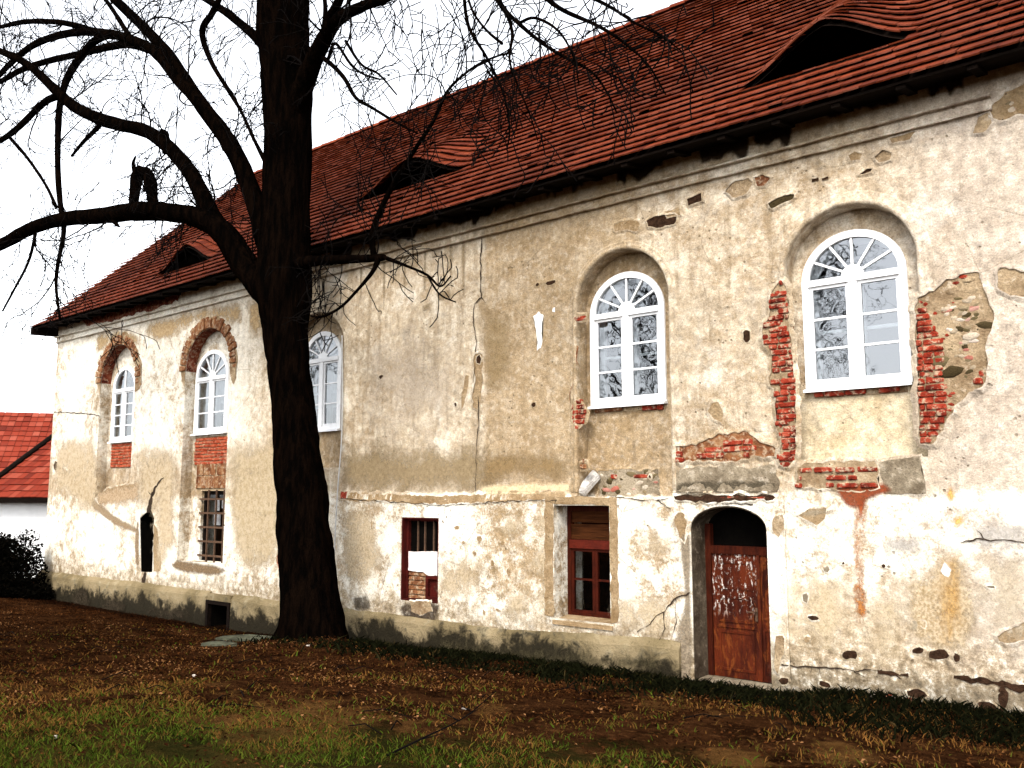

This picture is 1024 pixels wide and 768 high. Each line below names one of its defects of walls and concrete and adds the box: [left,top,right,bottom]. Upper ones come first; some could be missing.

spalling [970,79,1024,137]
spalling [846,129,920,178]
spalling [612,190,706,235]
spalling [723,172,798,213]
crack [473,239,485,352]
spalling [907,263,1024,450]
flaking render [572,397,590,430]
flaking render [579,277,881,544]
crack [147,477,164,513]
rust [837,484,889,617]
crack [961,531,1024,543]
crack [637,592,690,640]